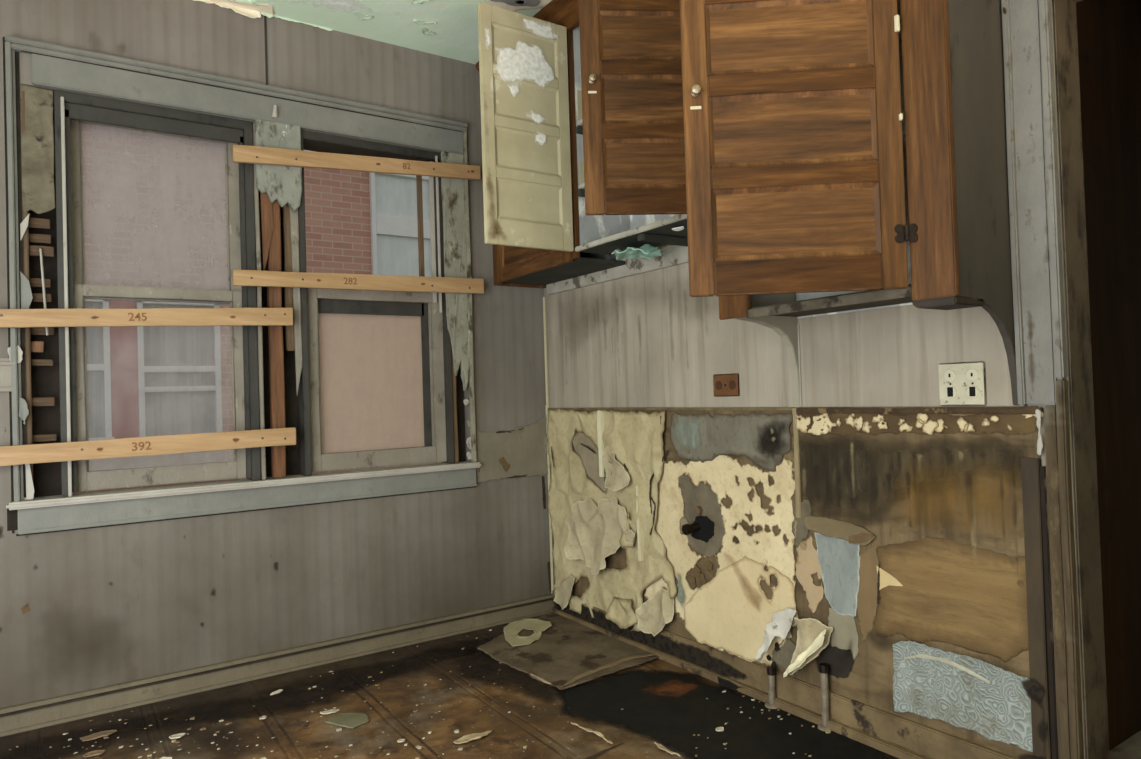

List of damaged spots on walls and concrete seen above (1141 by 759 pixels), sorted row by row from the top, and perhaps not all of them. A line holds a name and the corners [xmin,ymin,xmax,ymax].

peeling [193,0,333,31]
peeling [485,0,552,12]
spalling [20,84,58,309]
spalling [7,327,61,445]
spalling [24,462,62,500]
damp [799,439,1023,522]
flaking render [644,409,1044,678]
damp [0,597,898,759]